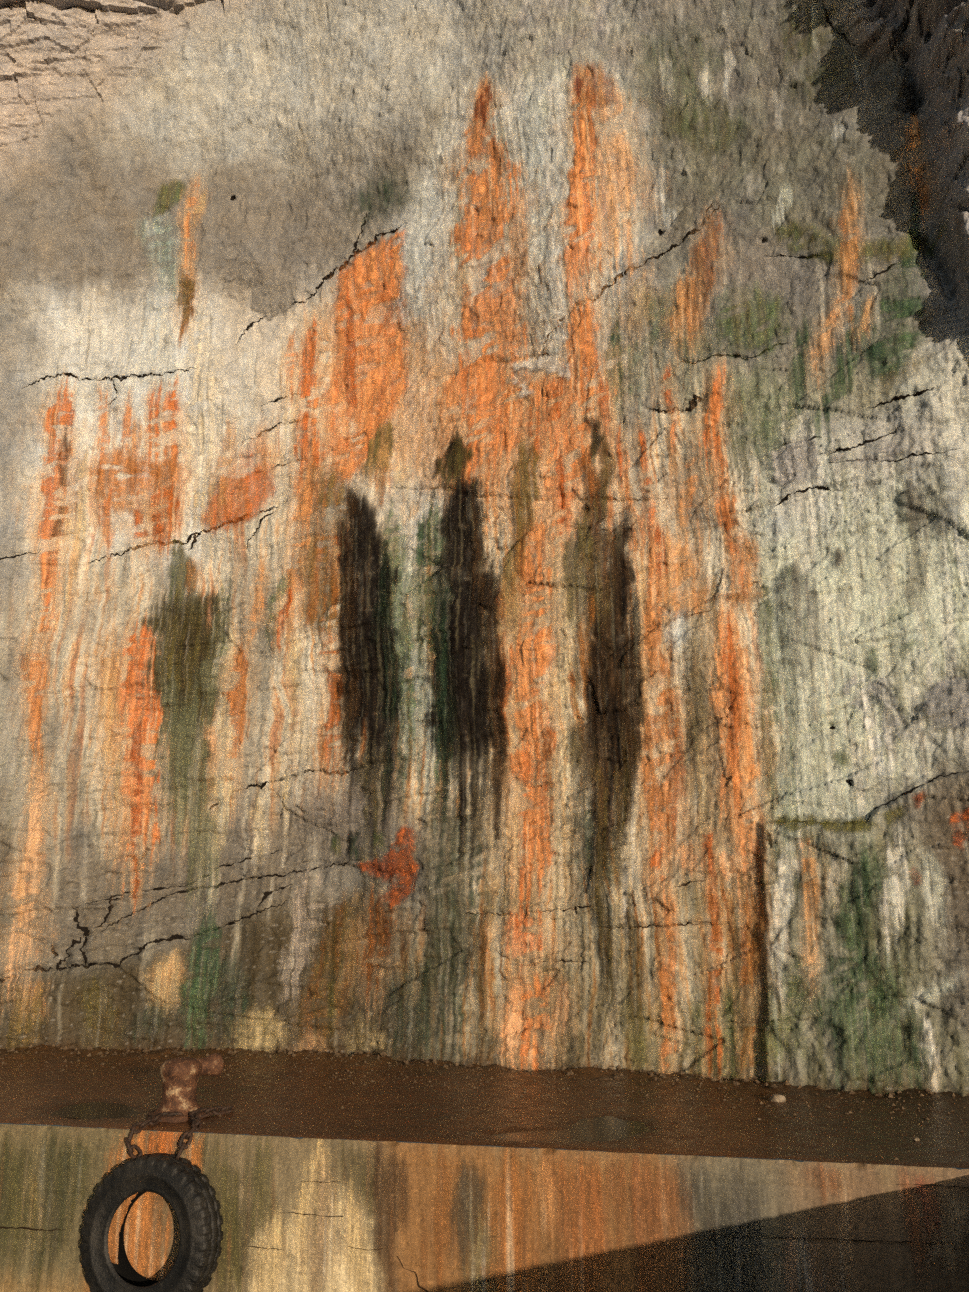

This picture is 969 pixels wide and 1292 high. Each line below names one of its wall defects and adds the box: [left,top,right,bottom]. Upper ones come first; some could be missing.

crack [25,367,193,405]
corrosion [38,380,181,632]
leakage [50,293,257,896]
crack [88,459,301,563]
leakage [332,82,540,1058]
corrosion [203,66,766,1075]
crack [769,387,953,506]
corrosion [99,615,164,911]
crack [0,763,383,983]
leakage [548,417,645,1027]
corrosion [108,1192,173,1281]
leakage [200,1135,407,1292]